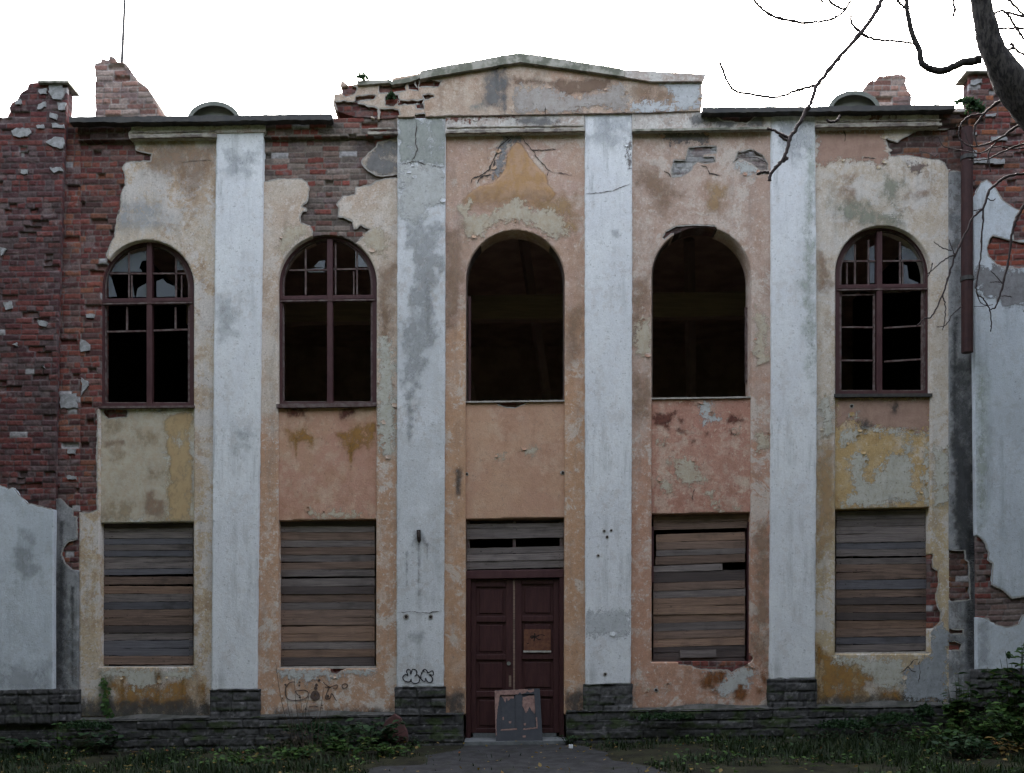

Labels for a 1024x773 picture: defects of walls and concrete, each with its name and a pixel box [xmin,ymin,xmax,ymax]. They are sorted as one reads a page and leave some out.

spalling [264,79,571,259]
crack [400,107,693,194]
spalling [659,133,717,178]
spalling [733,149,768,180]
spalling [815,74,1024,312]
spalling [0,82,193,570]
leakage [403,221,462,412]
peeling [655,437,742,512]
peeling [694,400,720,428]
peeling [817,394,949,509]
spalling [830,536,1024,702]